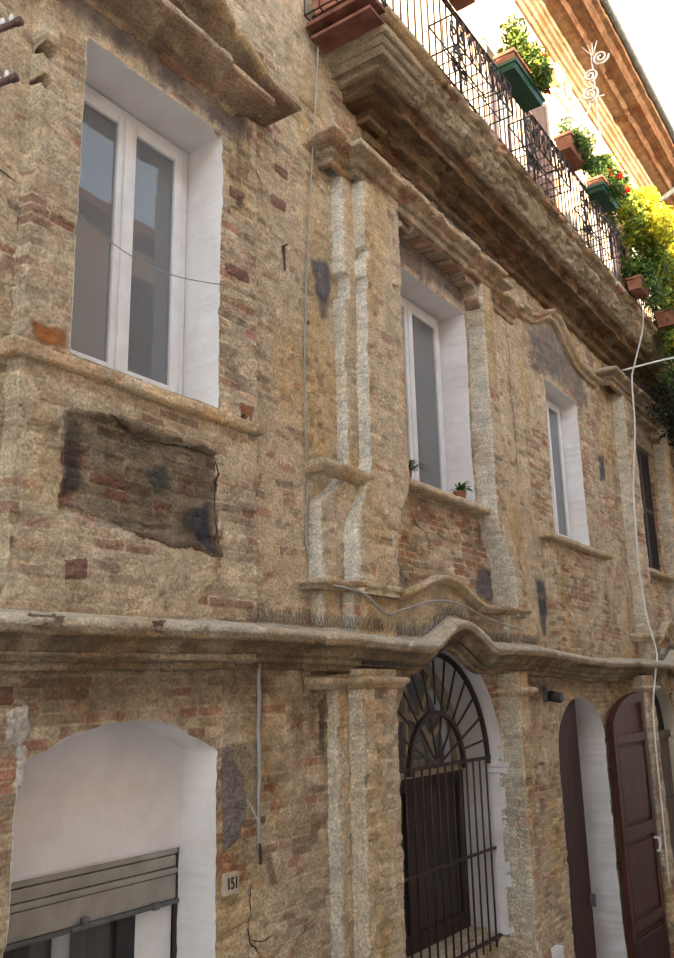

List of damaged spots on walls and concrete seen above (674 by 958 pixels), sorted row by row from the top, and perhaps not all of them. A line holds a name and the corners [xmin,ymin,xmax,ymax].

spalling [57,408,223,558]
crack [109,412,219,550]
spalling [64,558,88,580]
crack [248,883,274,958]